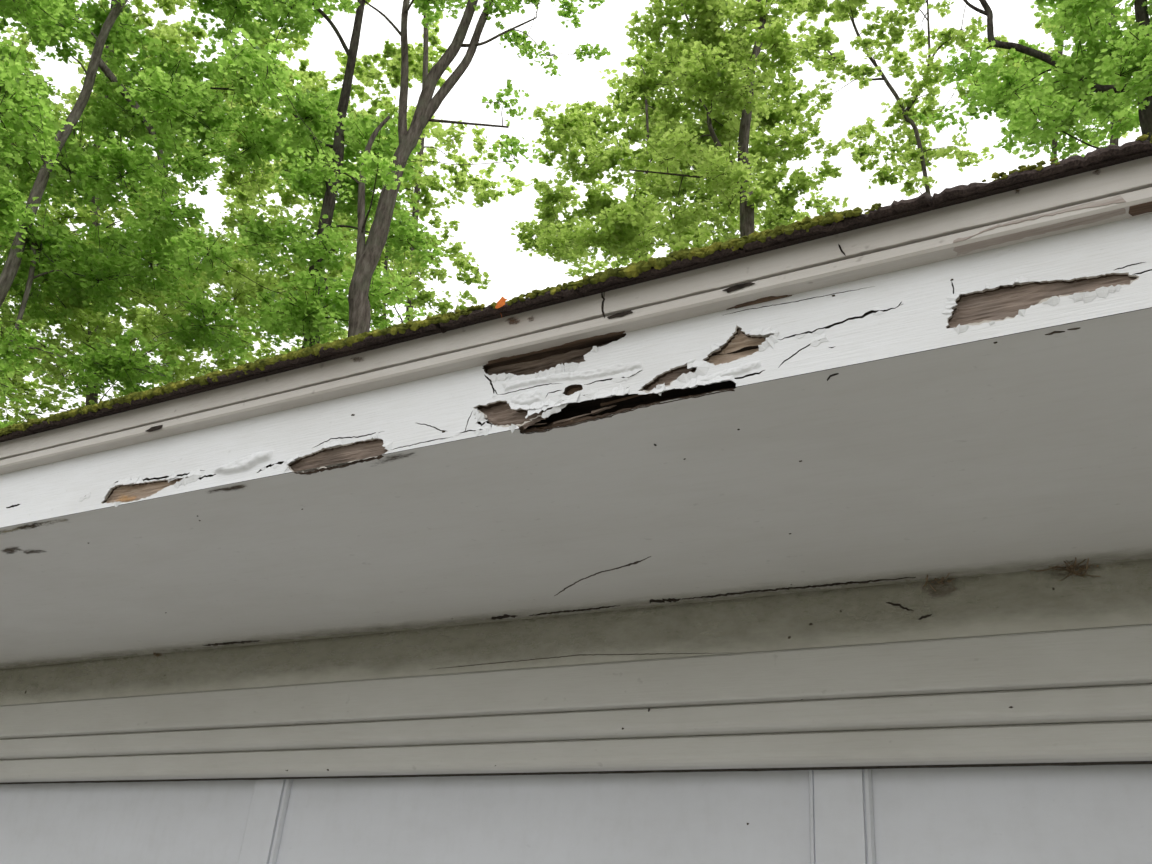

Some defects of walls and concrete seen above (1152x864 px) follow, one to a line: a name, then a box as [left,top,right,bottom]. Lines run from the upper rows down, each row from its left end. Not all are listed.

crack [1115,262,1152,275]
crack [725,286,902,381]
peeling [942,273,1139,335]
peeling [473,326,779,433]
peeling [283,431,393,475]
peeling [102,469,202,507]
crack [491,556,651,620]
crack [649,577,932,620]
crack [204,639,259,647]
mould [0,574,995,692]